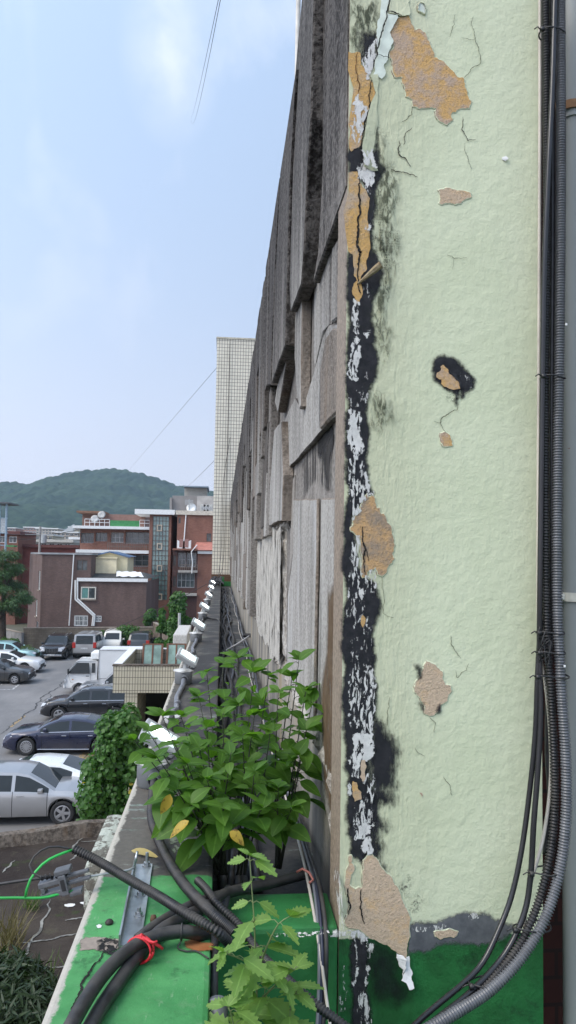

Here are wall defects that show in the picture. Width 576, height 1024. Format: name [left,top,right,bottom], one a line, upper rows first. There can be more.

crack [450,15,481,77]
crack [392,111,417,177]
water stain [432,355,476,404]
water stain [302,135,399,871]
flaking render [298,0,472,990]
water stain [350,886,513,1024]